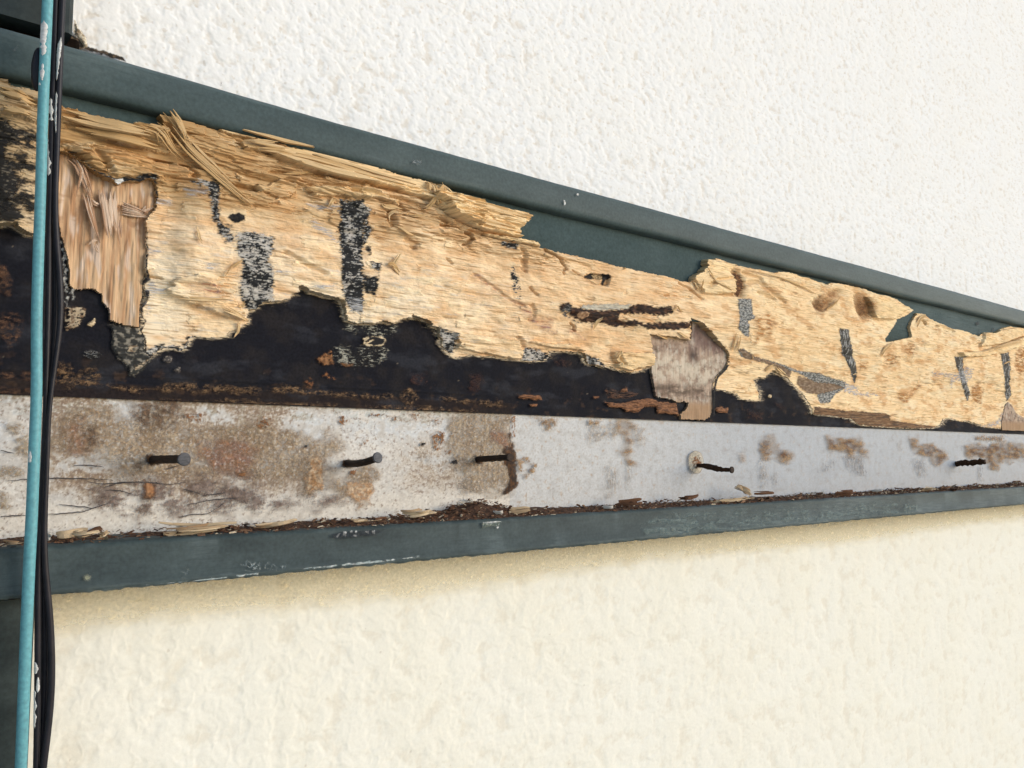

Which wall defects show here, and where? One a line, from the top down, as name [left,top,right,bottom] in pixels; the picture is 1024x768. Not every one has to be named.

peeling [362,218,382,297]
spalling [560,303,691,330]
peeling [318,351,334,365]
peeling [363,336,386,346]
peeling [594,388,679,416]
rust [421,420,457,464]
rust [503,416,537,495]
rust [829,438,868,473]
rust [911,439,948,475]
rust [966,435,1024,476]
crack [9,465,236,517]
rust [334,459,380,504]